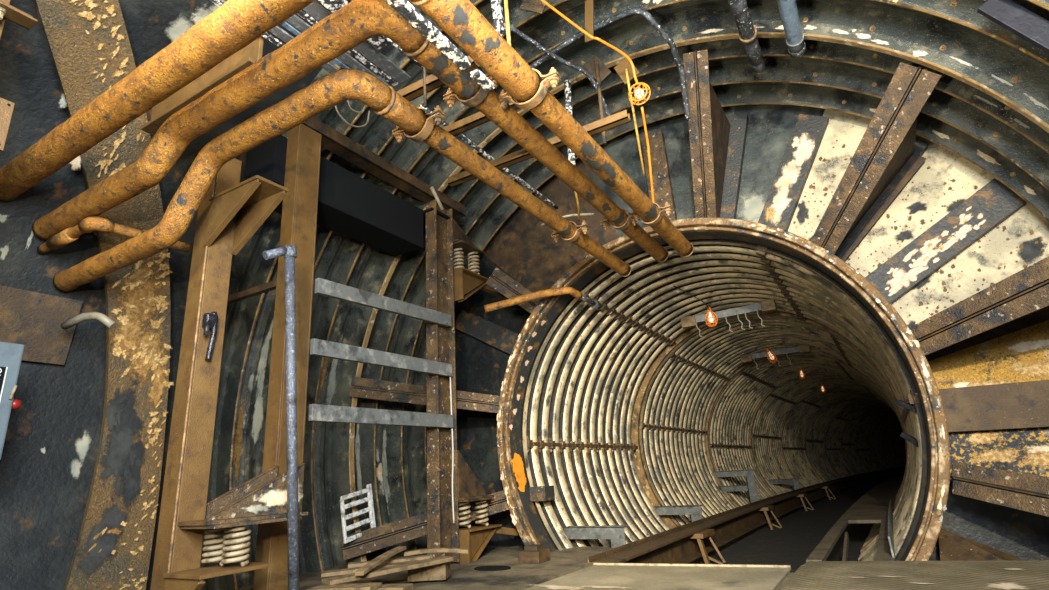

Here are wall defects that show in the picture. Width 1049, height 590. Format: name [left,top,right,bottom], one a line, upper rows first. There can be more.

peeling [751,133,862,282]
peeling [872,206,986,408]
peeling [1008,339,1049,353]
water stain [78,372,145,575]
peeling [936,485,946,522]
peeling [1027,445,1049,453]